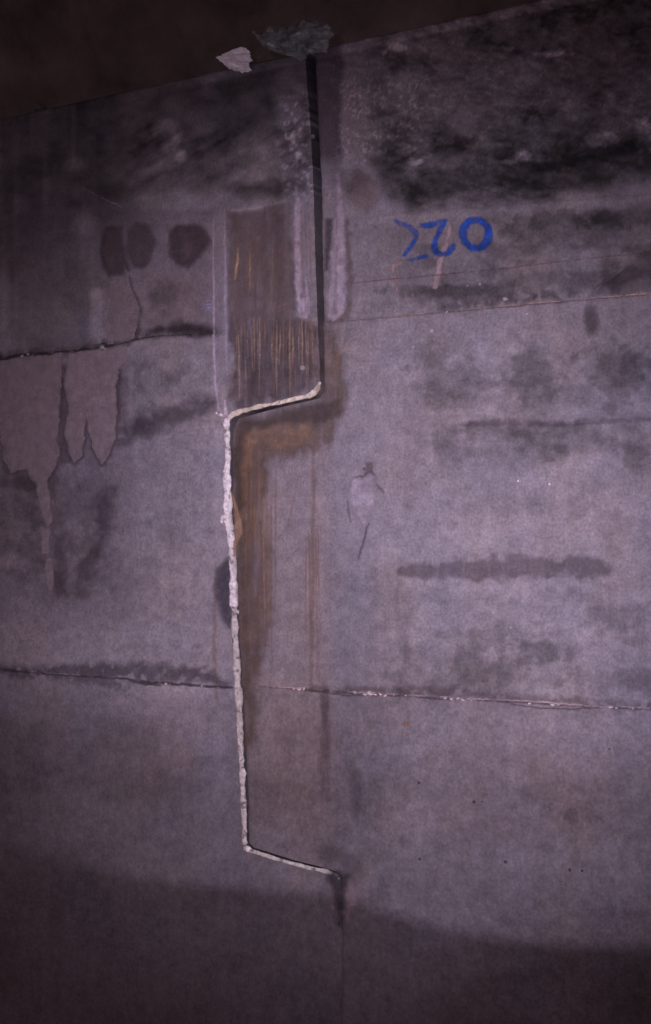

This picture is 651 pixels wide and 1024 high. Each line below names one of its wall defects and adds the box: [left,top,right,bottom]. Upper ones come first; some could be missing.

water stain [100,224,154,275]
crack [0,324,213,361]
water stain [118,221,228,446]
rust [229,206,346,744]
water stain [398,555,608,582]
crack [0,664,233,688]
crack [266,686,650,710]